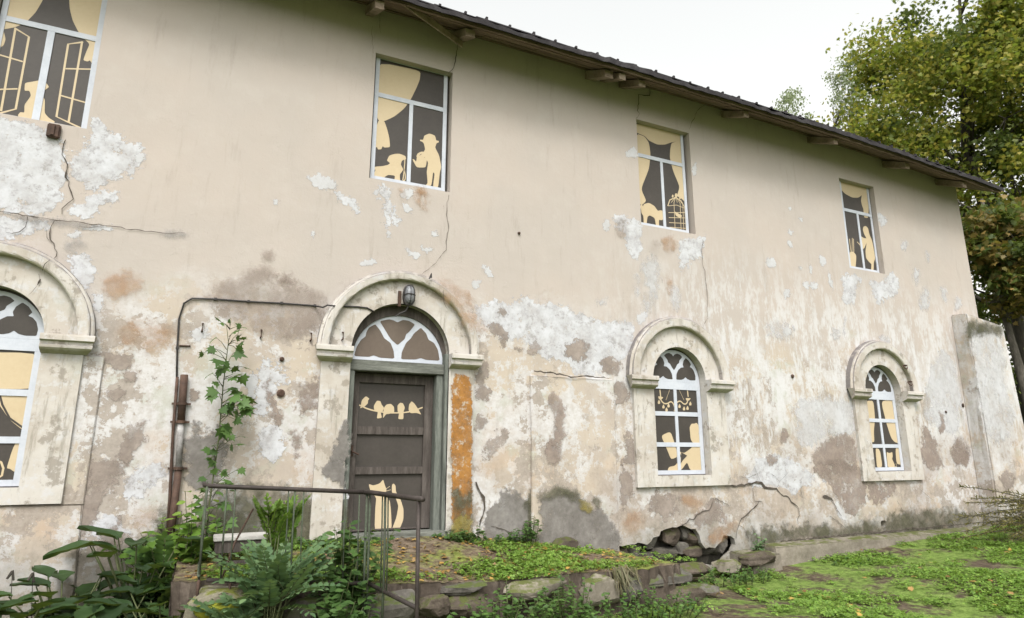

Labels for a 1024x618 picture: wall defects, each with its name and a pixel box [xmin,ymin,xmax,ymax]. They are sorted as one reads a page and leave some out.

peeling [0,117,146,241]
crack [0,140,181,288]
peeling [306,172,361,214]
peeling [471,214,659,405]
peeling [677,236,706,272]
peeling [798,255,901,305]
peeling [246,357,320,464]
rust [450,373,473,532]
flaking render [475,413,510,459]
crack [534,370,609,379]
damp [524,484,580,533]
crack [682,464,974,542]